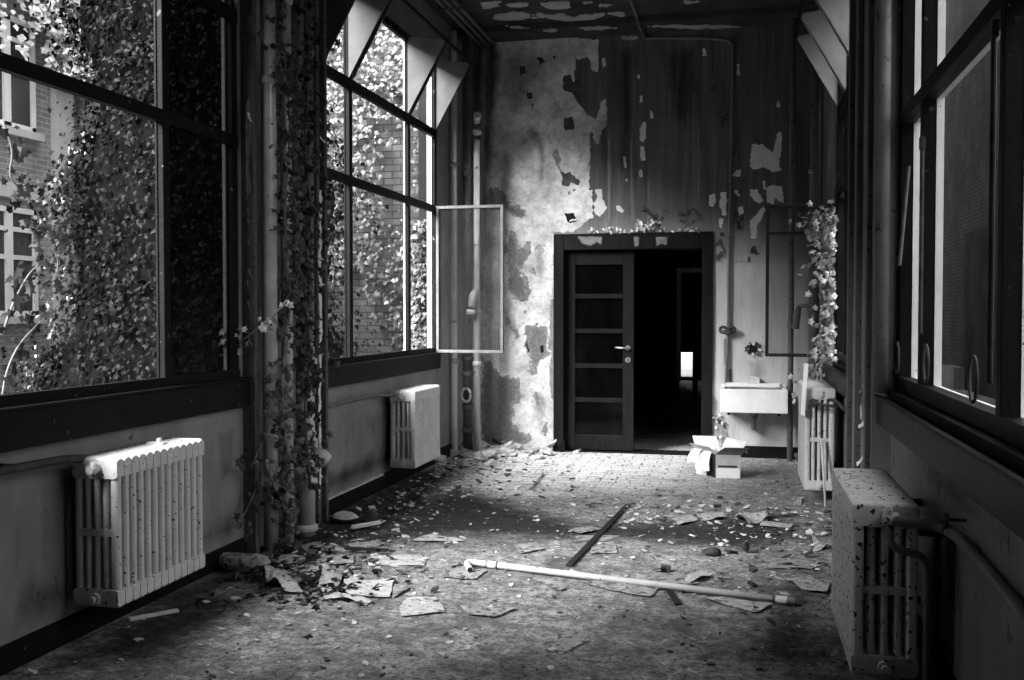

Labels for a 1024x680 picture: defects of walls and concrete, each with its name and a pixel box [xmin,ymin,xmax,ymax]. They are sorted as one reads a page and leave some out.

flaking render [480,1,784,450]